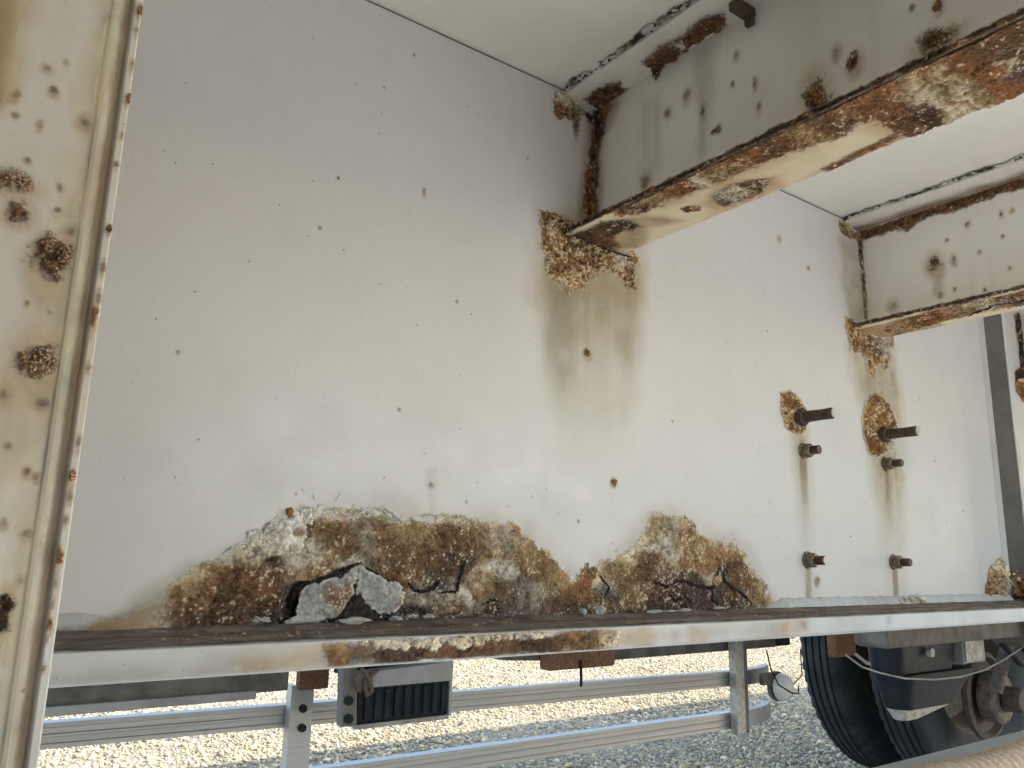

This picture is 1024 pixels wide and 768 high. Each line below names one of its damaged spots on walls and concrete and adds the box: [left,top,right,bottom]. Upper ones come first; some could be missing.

corrosion [539,7,1024,304]
corrosion [0,158,35,225]
corrosion [28,230,75,283]
corrosion [17,344,60,380]
corrosion [839,174,1024,497]
corrosion [780,390,807,443]
peeling [224,488,402,555]
corrosion [985,557,1024,601]
corrosion [322,629,621,666]